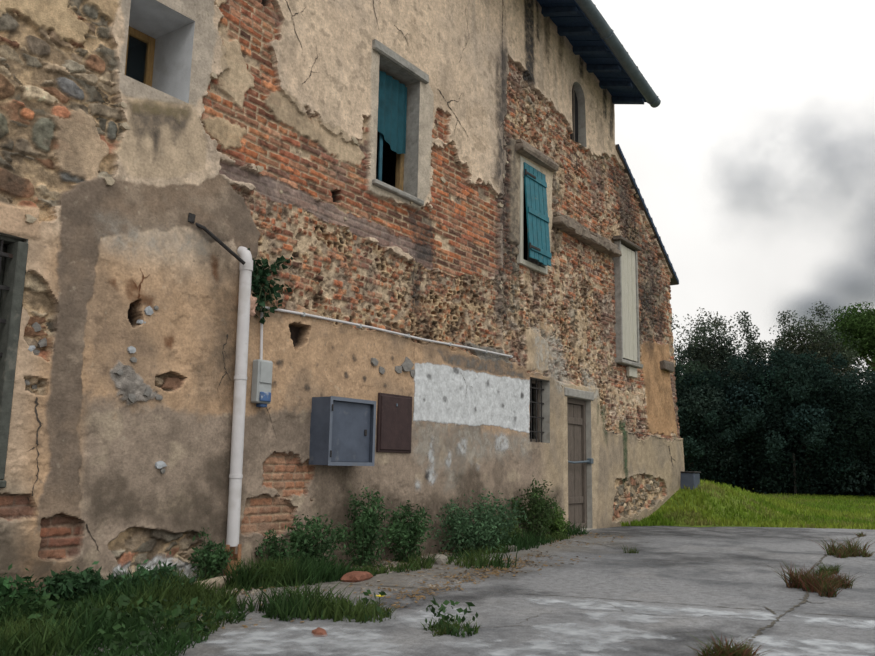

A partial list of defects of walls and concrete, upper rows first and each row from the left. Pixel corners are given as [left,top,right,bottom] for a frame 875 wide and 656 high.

crack [286,1,318,84]
spalling [200,0,680,441]
spalling [128,300,159,327]
crack [27,397,43,502]
spalling [0,492,85,559]
spalling [240,451,316,538]